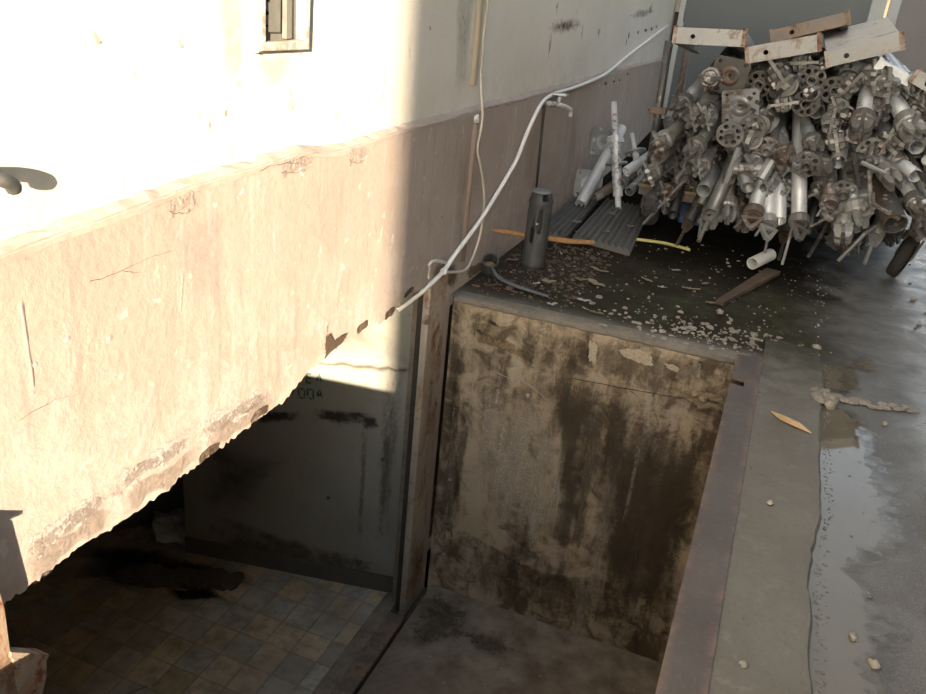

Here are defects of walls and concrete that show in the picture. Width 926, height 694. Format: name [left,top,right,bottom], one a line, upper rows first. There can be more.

water stain [475,323,534,368]
flaking render [113,430,190,508]
flaking render [199,390,268,464]
water stain [260,412,295,422]
water stain [320,411,378,428]
water stain [441,355,467,533]
water stain [470,340,697,620]
flaking render [30,494,103,573]
water stain [171,589,218,600]